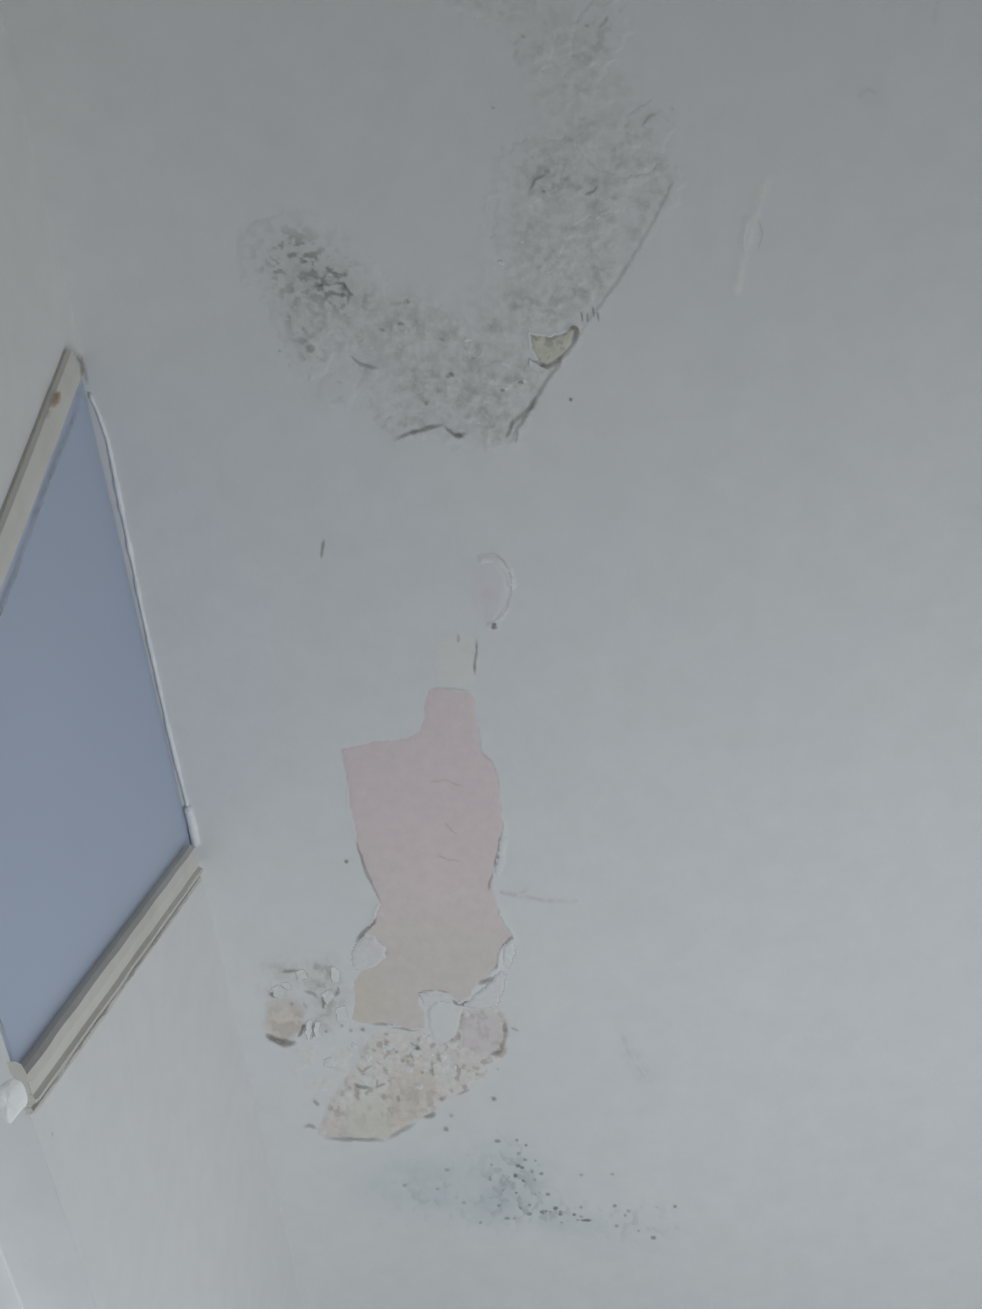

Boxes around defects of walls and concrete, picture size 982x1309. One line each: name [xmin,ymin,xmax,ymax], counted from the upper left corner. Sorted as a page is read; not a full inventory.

water stain [305,1108,718,1272]